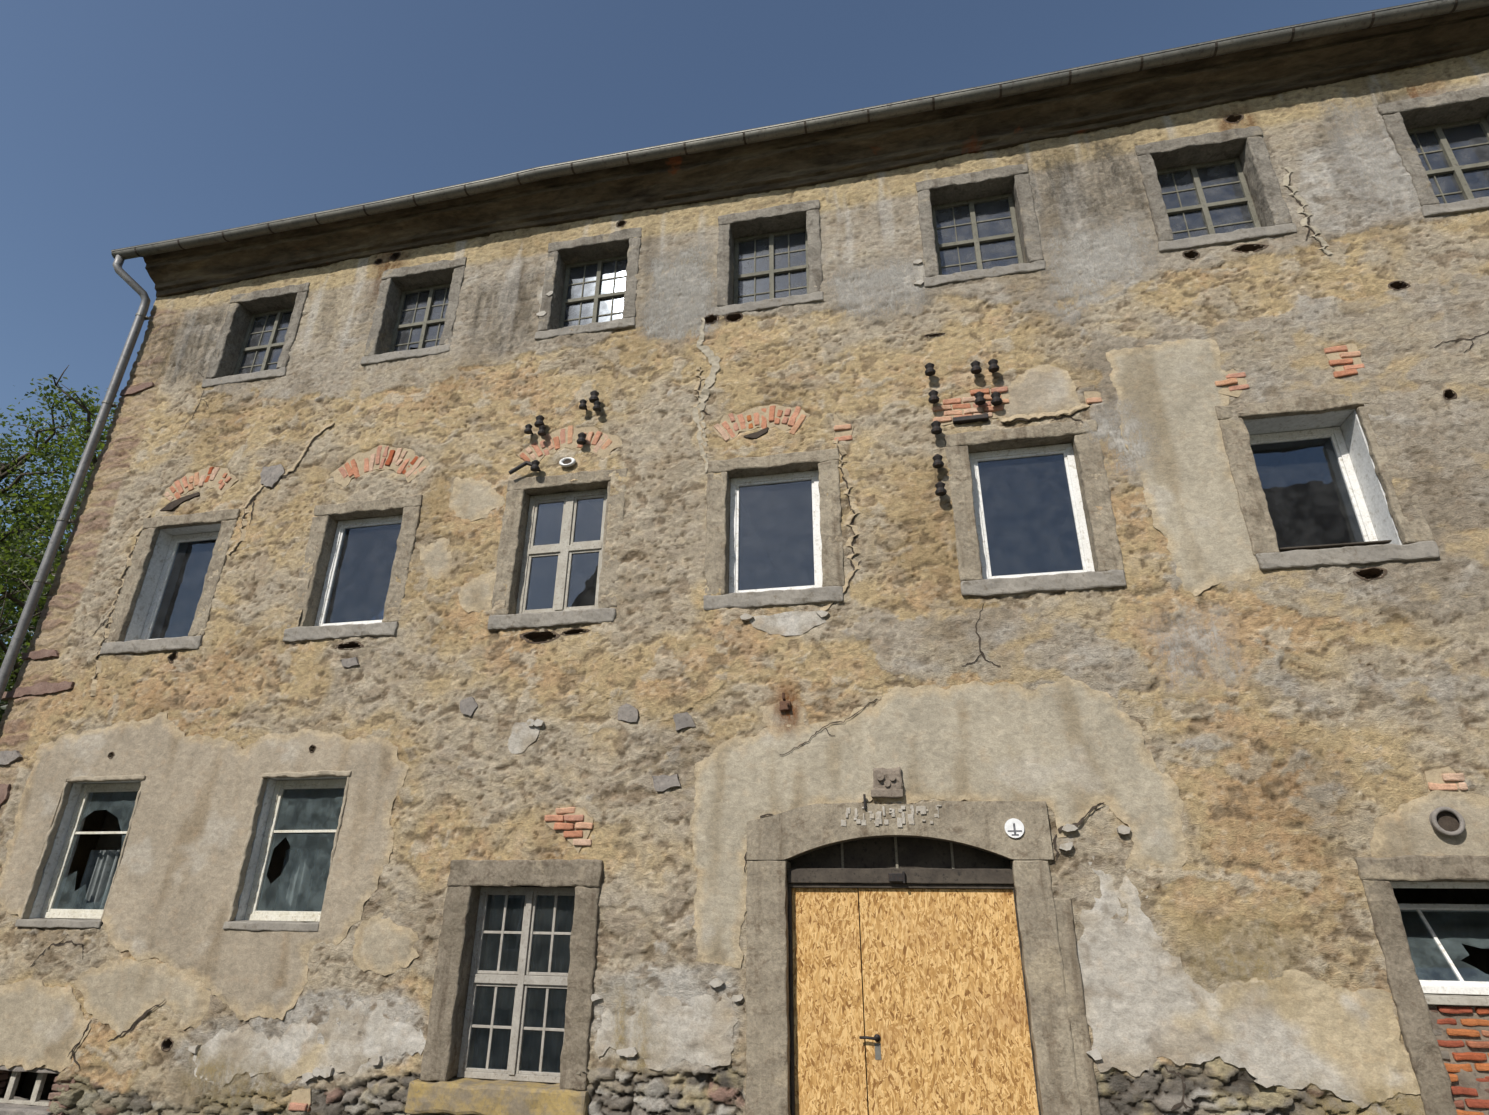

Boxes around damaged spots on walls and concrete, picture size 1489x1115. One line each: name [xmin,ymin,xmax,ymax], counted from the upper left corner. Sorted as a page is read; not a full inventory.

crack [1434,331,1489,353]
flaking render [120,381,154,396]
flaking render [519,426,612,462]
flaking render [338,446,426,479]
flaking render [164,467,232,501]
spalling [519,628,590,644]
crack [963,604,1001,667]
spalling [335,641,364,668]
crack [780,699,876,755]
peeling [1059,824,1420,1109]
crack [68,1000,165,1069]
peeling [161,997,426,1112]